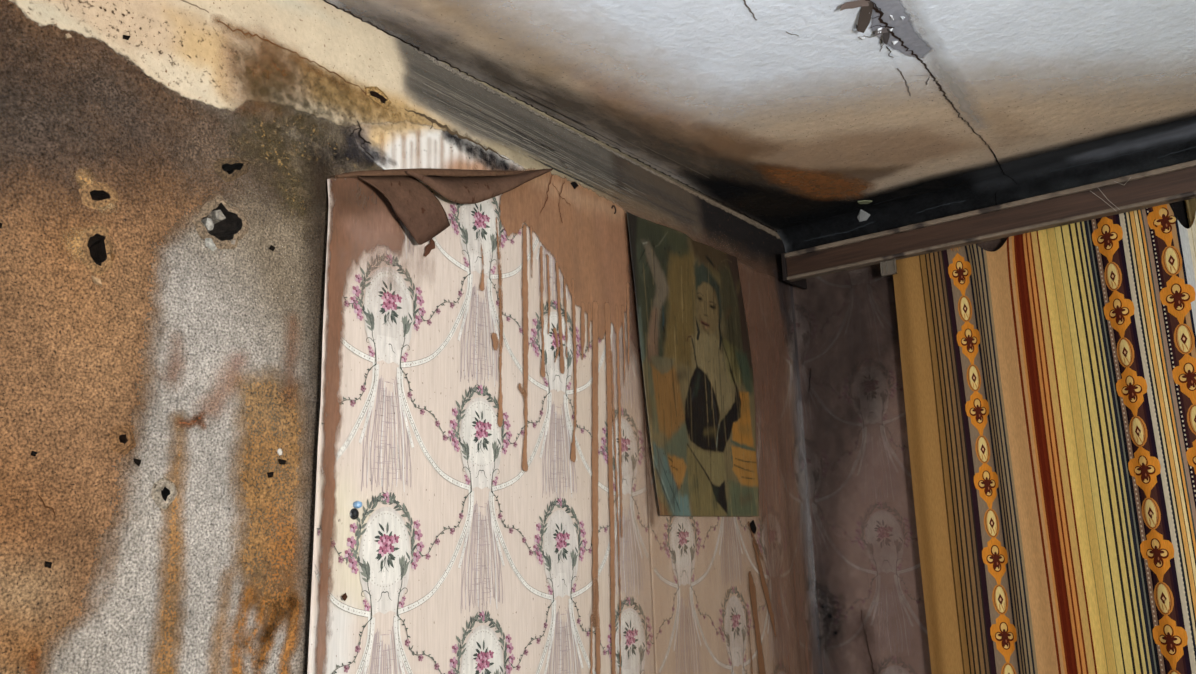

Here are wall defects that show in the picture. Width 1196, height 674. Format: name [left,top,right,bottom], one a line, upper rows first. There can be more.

peeling [10,0,785,287]
damp [338,0,1196,253]
crack [856,0,1017,205]
damp [0,0,412,674]
damp [415,72,651,674]
corrosion [153,413,206,674]
corrosion [213,376,305,674]